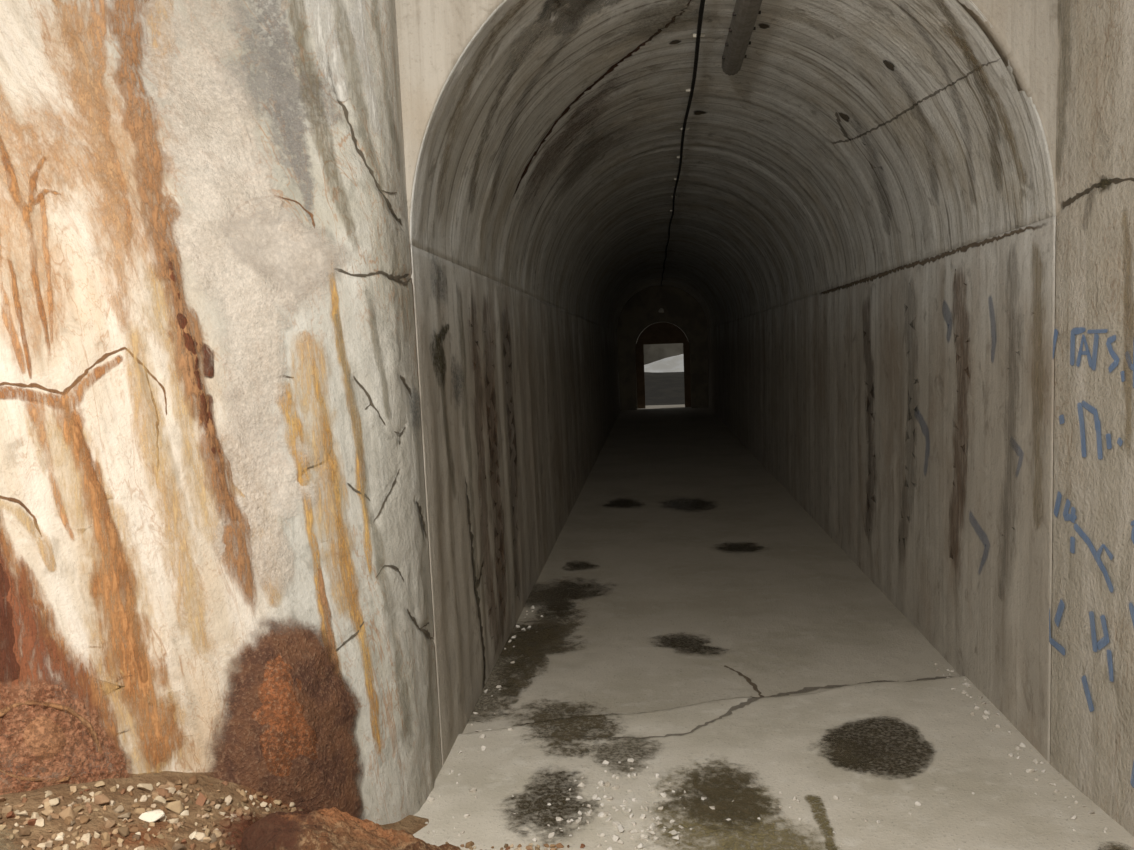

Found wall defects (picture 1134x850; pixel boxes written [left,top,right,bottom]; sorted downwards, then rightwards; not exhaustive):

crack [834,61,996,144]
rust [0,0,279,652]
crack [0,347,167,461]
rust [278,264,380,747]
rust [0,401,182,775]
leakage [565,562,597,571]
crack [559,666,965,739]
leakage [821,717,934,778]
leakage [505,771,597,843]